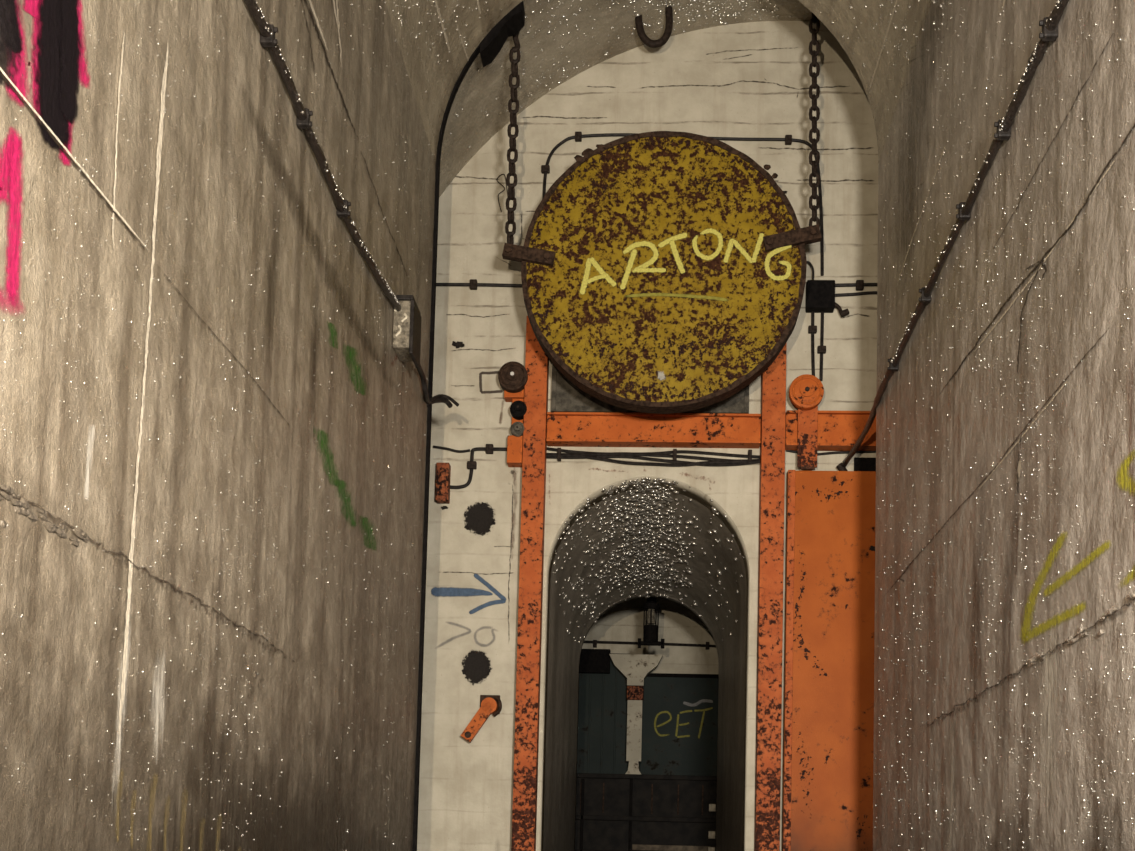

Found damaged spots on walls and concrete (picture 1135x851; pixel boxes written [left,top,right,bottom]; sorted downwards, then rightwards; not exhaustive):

crack [993,34,1113,249]
crack [945,123,1135,386]
rust [795,479,859,502]
rust [793,545,829,677]
rust [794,722,832,818]